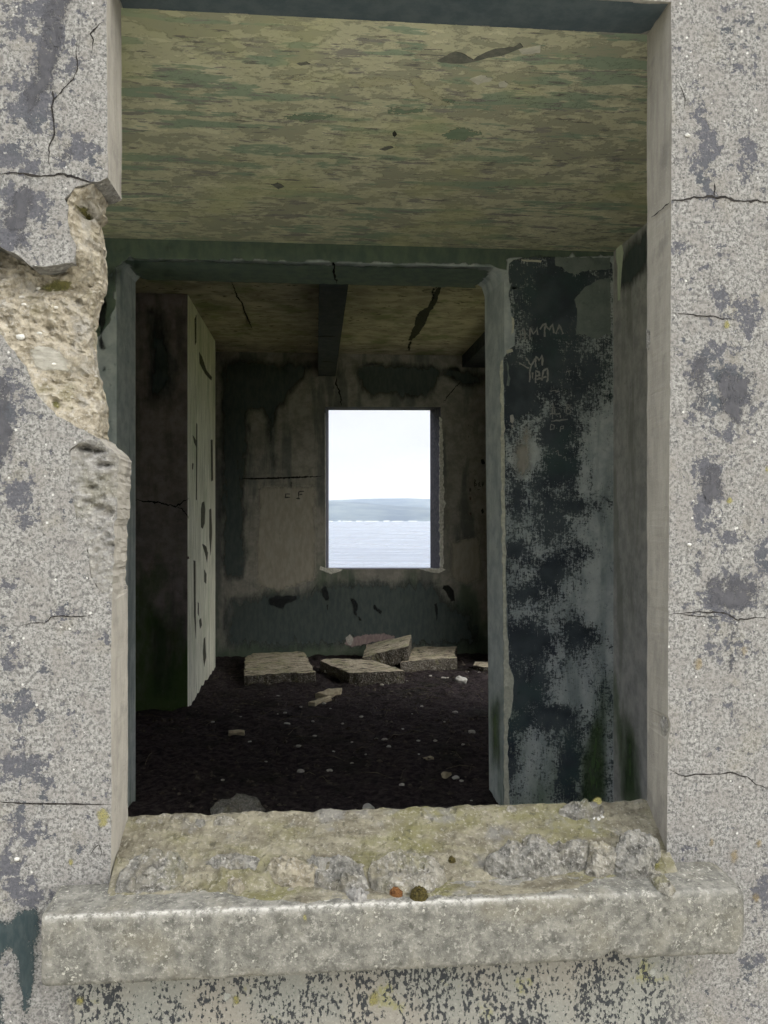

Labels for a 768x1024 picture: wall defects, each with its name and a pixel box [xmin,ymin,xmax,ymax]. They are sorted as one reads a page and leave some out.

peeling [437,43,541,64]
crack [3,22,102,183]
crack [652,183,768,217]
crack [232,284,253,330]
peeling [194,317,212,380]
spalling [0,183,132,601]
damp [356,363,484,399]
crack [137,498,189,515]
peeling [192,423,212,666]
crack [674,611,765,621]
crack [669,769,768,789]